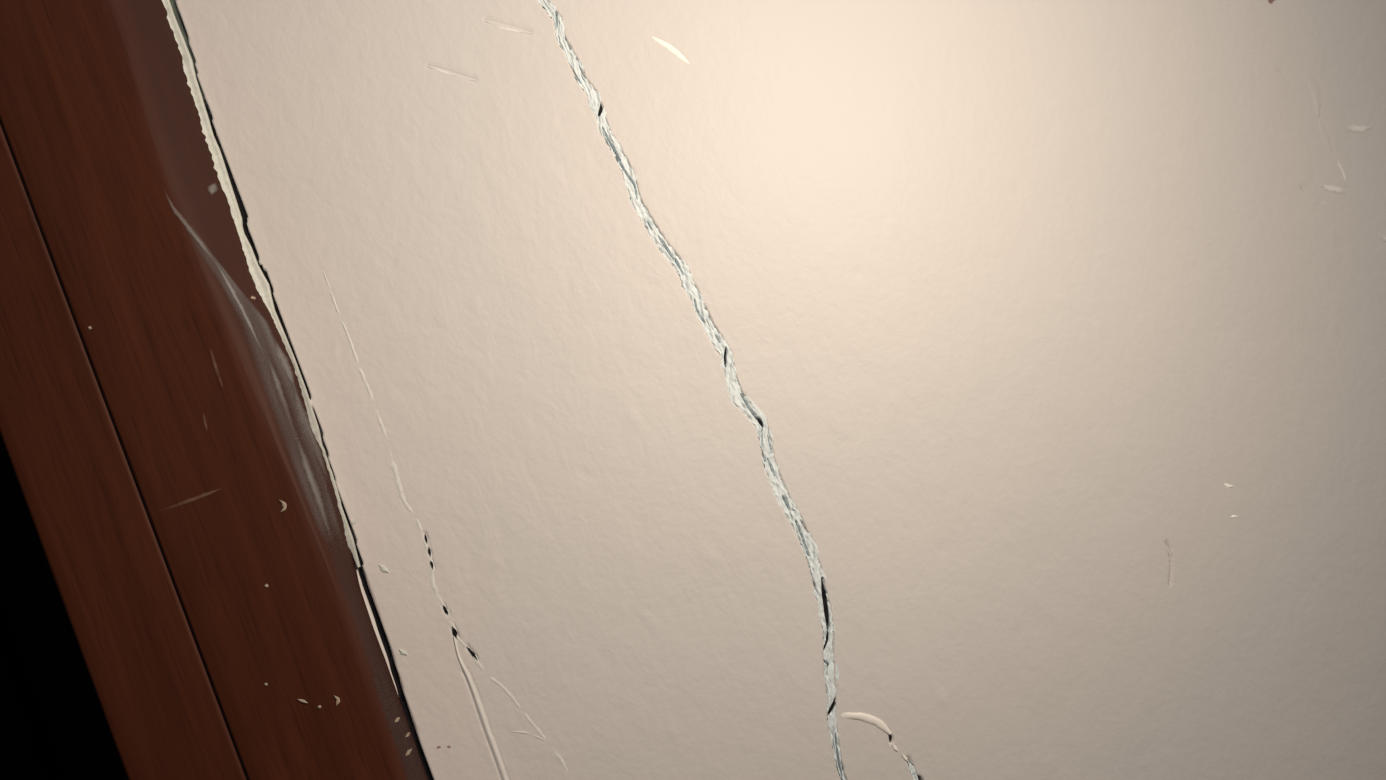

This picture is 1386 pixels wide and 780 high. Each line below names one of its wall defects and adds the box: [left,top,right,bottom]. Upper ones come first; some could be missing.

crack [162,0,434,780]
crack [323,271,568,780]
crack [538,0,919,780]